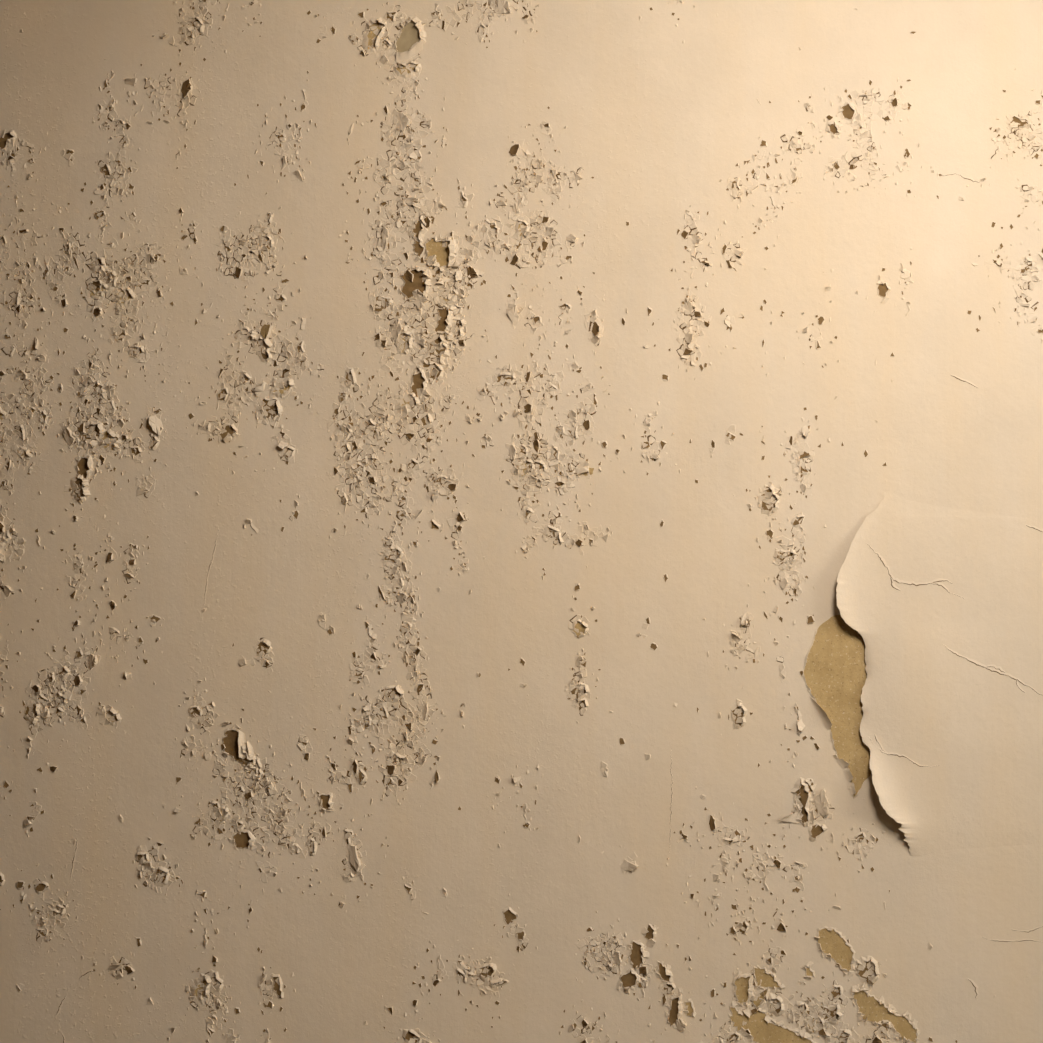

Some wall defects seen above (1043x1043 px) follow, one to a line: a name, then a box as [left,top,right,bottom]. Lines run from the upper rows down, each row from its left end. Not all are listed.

peeling [644,77,943,382]
peeling [978,241,1043,343]
peeling [980,89,1043,231]
peeling [0,0,266,759]
peeling [175,0,680,928]
peeling [575,407,1043,1043]
peeling [23,787,45,837]
peeling [133,837,183,896]
peeling [559,1000,620,1043]